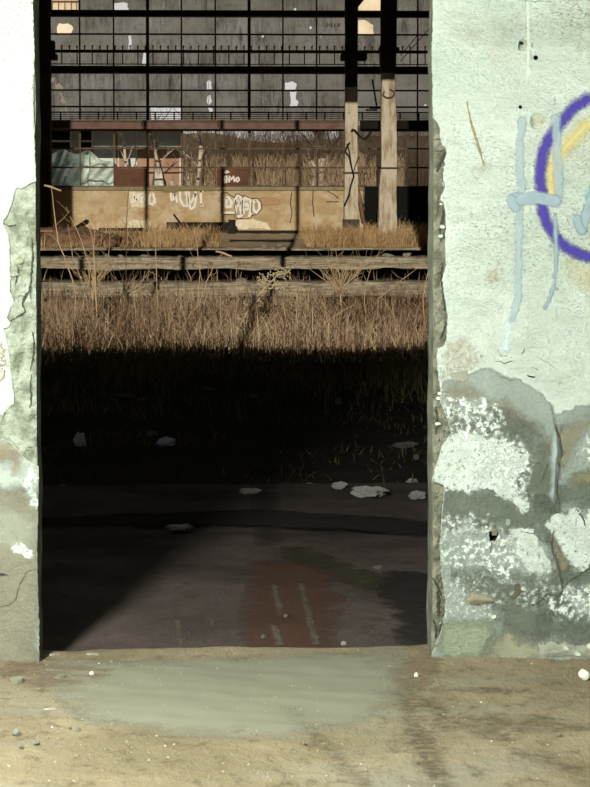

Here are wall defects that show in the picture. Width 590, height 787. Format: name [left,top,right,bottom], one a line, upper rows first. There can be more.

flaking render [0,182,39,508]
leakage [0,440,428,662]
peeling [431,119,590,652]
crack [522,529,590,605]
crack [537,405,586,526]
flaking render [537,638,590,660]